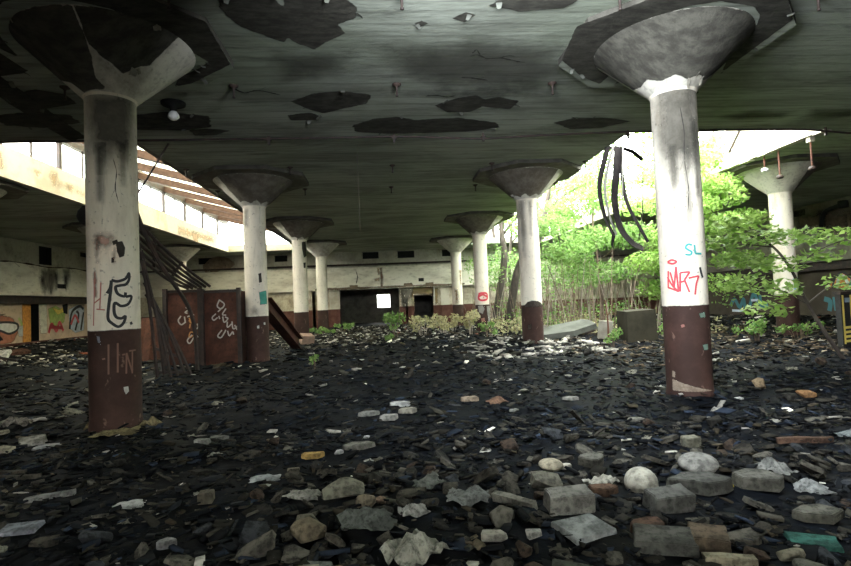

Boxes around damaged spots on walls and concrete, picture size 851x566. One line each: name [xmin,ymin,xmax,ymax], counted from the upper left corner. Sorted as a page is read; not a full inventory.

damp [88,94,133,199]
peeling [0,0,230,140]
peeling [218,0,363,49]
peeling [288,91,371,124]
peeling [353,95,520,135]
peeling [489,0,577,11]
damp [657,89,698,187]
peeling [562,0,797,90]